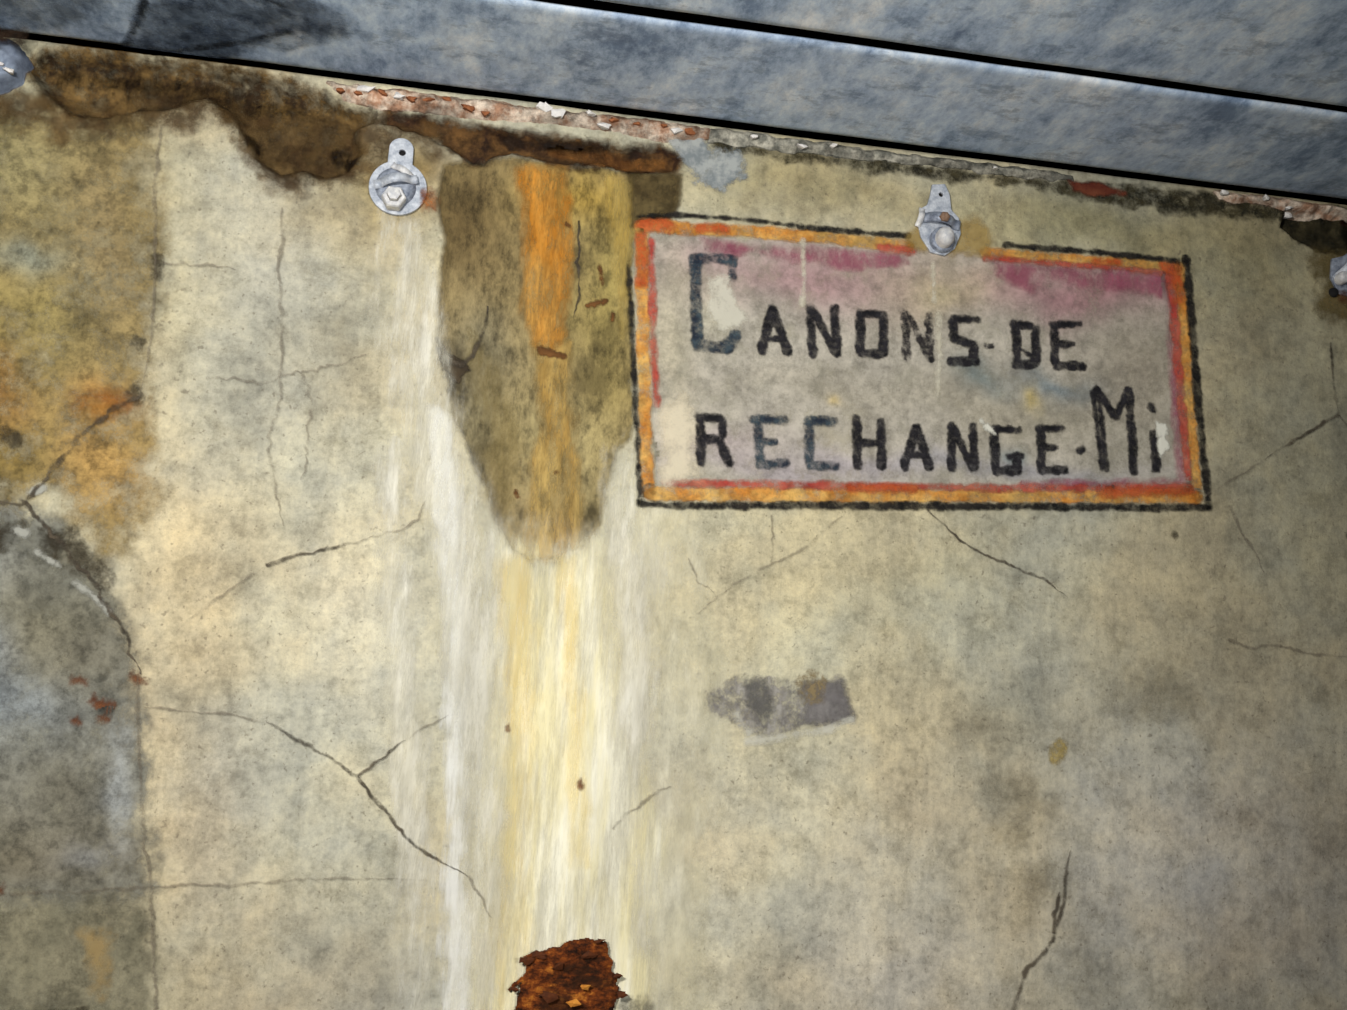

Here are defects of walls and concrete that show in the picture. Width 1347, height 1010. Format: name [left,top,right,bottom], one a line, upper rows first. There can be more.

crack [1267,414,1338,458]
crack [0,393,143,674]
crack [265,545,339,567]
leakage [381,225,853,1010]
crack [279,729,467,876]
corrosion [508,938,628,1010]
crack [1018,850,1071,998]